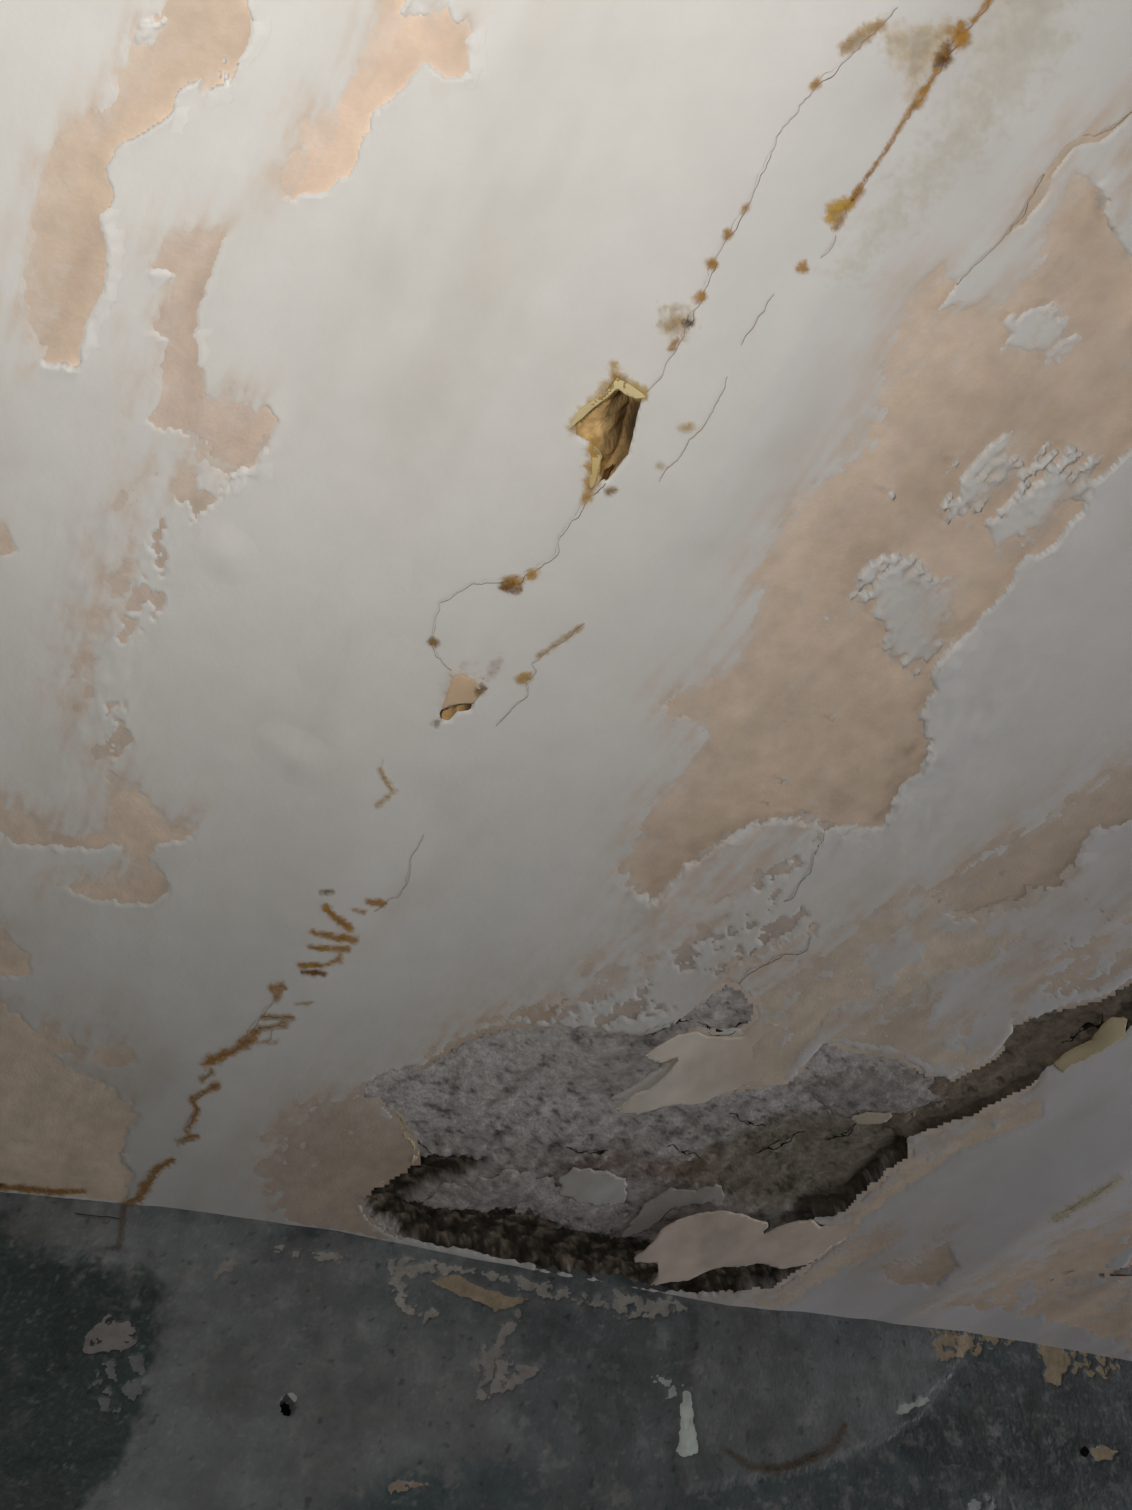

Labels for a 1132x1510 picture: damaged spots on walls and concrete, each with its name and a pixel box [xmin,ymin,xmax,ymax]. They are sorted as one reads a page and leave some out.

peeling [23,0,271,366]
crack [647,7,898,392]
rust [826,0,992,229]
crack [957,174,1045,285]
peeling [111,227,277,522]
crack [430,464,613,670]
crack [659,378,727,482]
peeling [618,111,1132,914]
rust [298,890,387,977]
rust [119,1158,174,1235]
rust [180,983,304,1143]
flaking render [253,855,1132,1401]